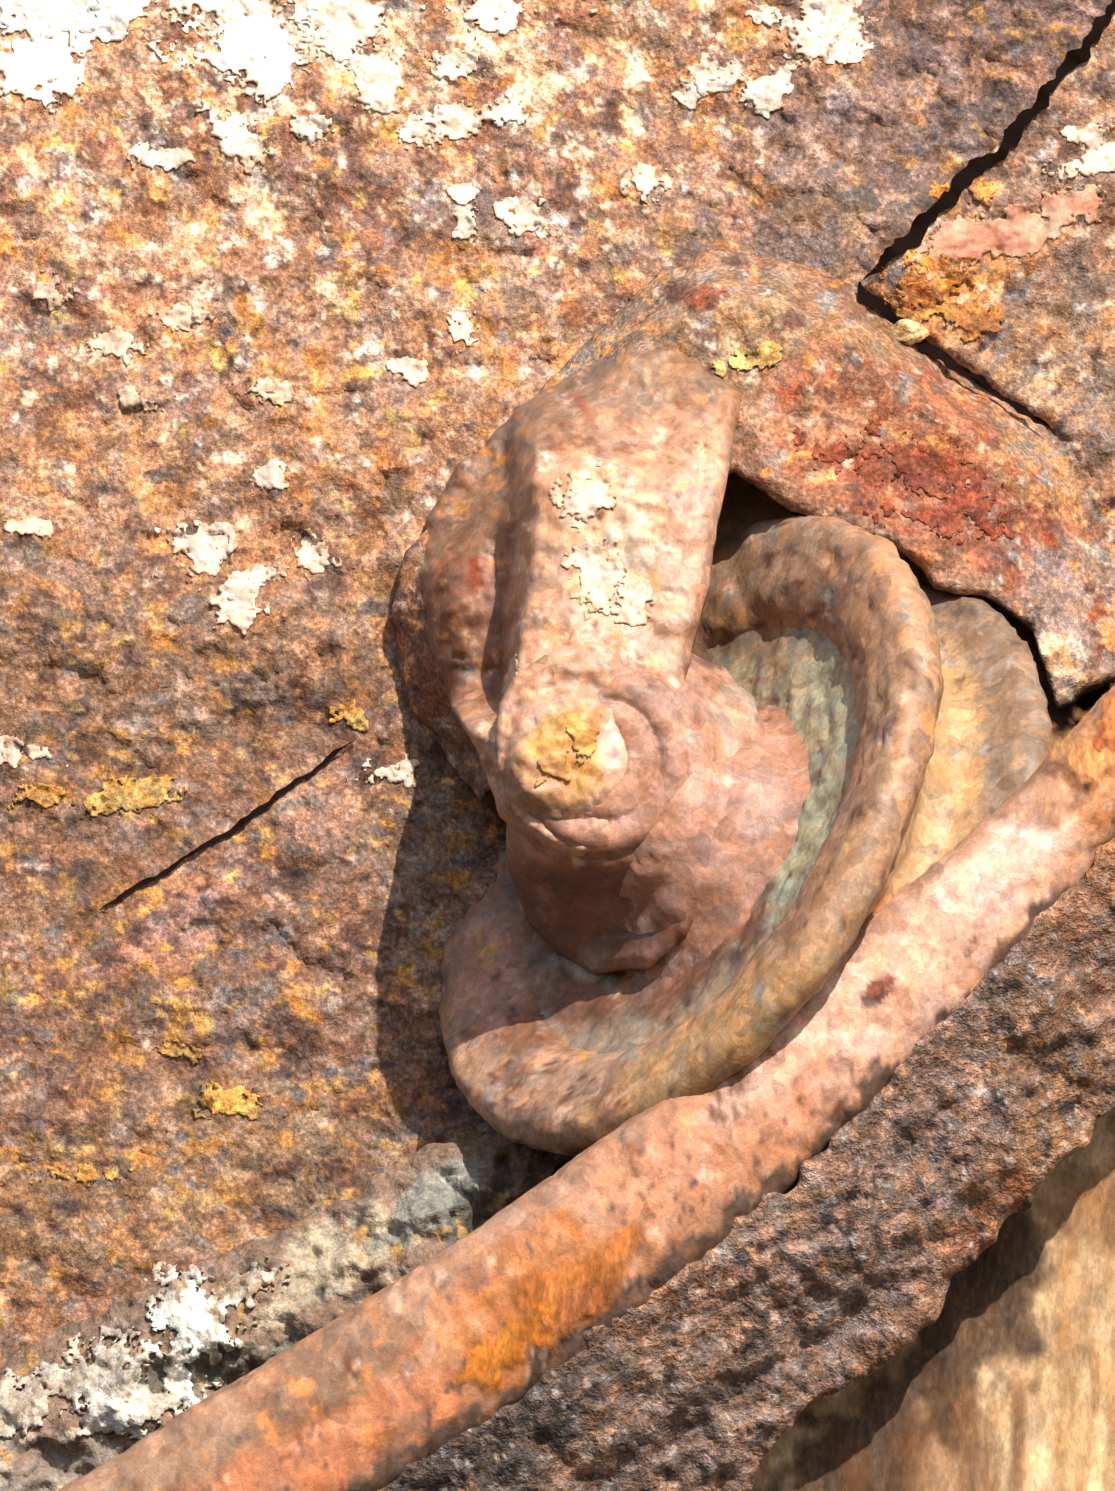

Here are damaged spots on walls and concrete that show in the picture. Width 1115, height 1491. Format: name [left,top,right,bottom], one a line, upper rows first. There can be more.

peeling [0,0,537,175]
peeling [446,183,551,242]
peeling [619,162,678,206]
rust [875,250,1006,343]
crack [857,0,1115,431]
rust [792,418,1014,545]
rust [7,773,189,816]
crack [100,739,355,910]
damp [1053,1173,1115,1245]
efflorescence [0,1256,291,1440]
rust [453,1223,646,1392]
damp [767,1210,1054,1491]